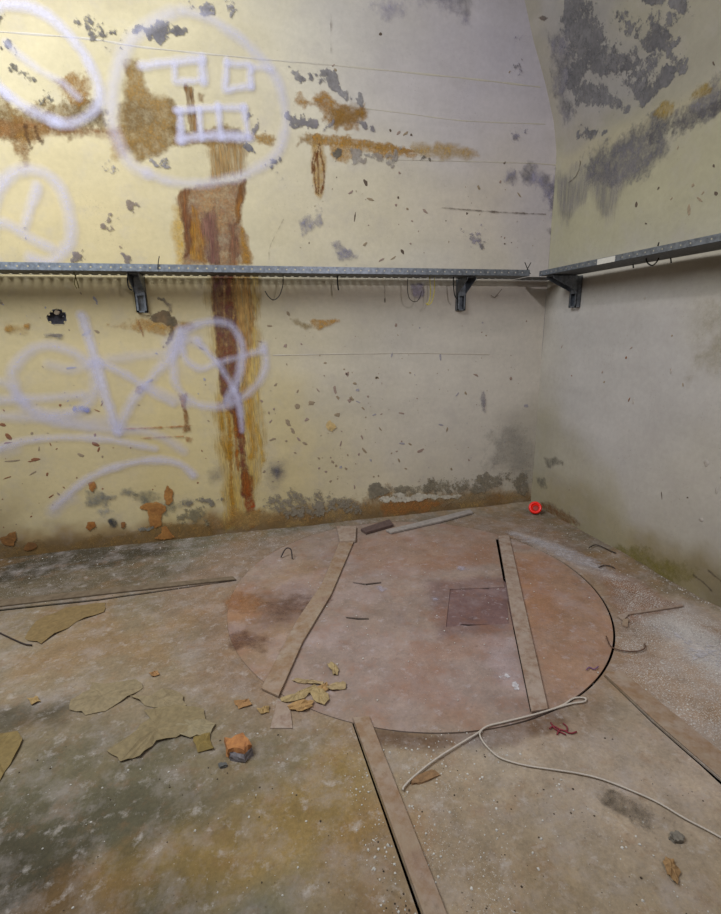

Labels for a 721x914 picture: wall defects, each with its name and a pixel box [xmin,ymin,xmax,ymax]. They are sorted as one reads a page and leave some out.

peeling [73,14,116,48]
peeling [131,19,187,45]
peeling [288,64,364,107]
rust [251,134,274,145]
peeling [284,111,334,130]
rust [297,92,471,194]
water stain [560,83,721,212]
rust [175,142,264,528]
spalling [0,423,58,484]
water stain [0,472,544,559]